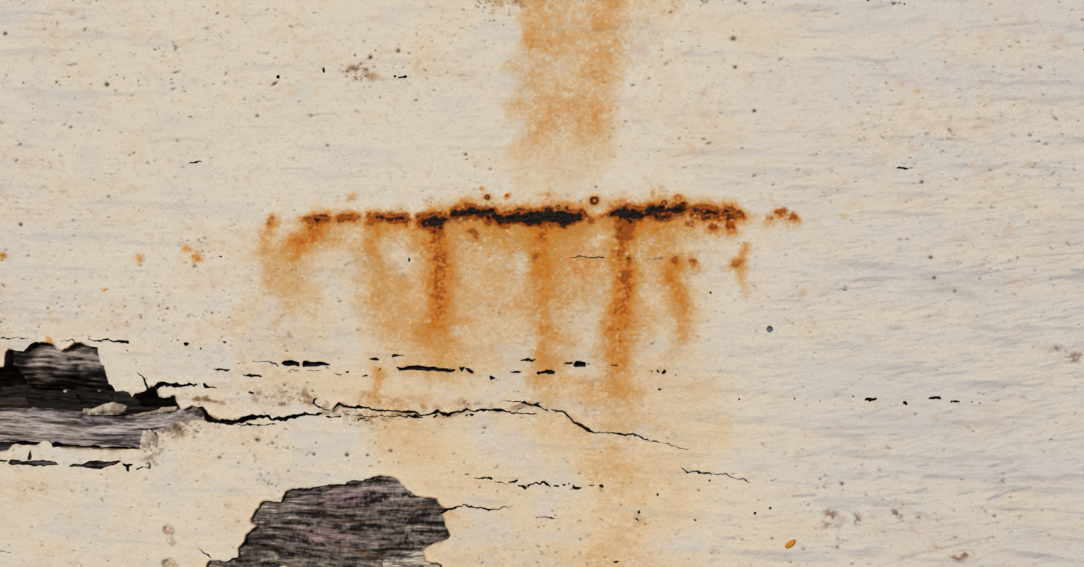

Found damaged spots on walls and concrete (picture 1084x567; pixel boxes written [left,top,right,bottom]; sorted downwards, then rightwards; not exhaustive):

corrosion [521,0,618,143]
corrosion [765,208,800,224]
corrosion [261,187,749,399]
peeling [0,342,207,451]
crack [58,338,751,483]
crack [853,396,980,406]
peeling [206,475,450,567]